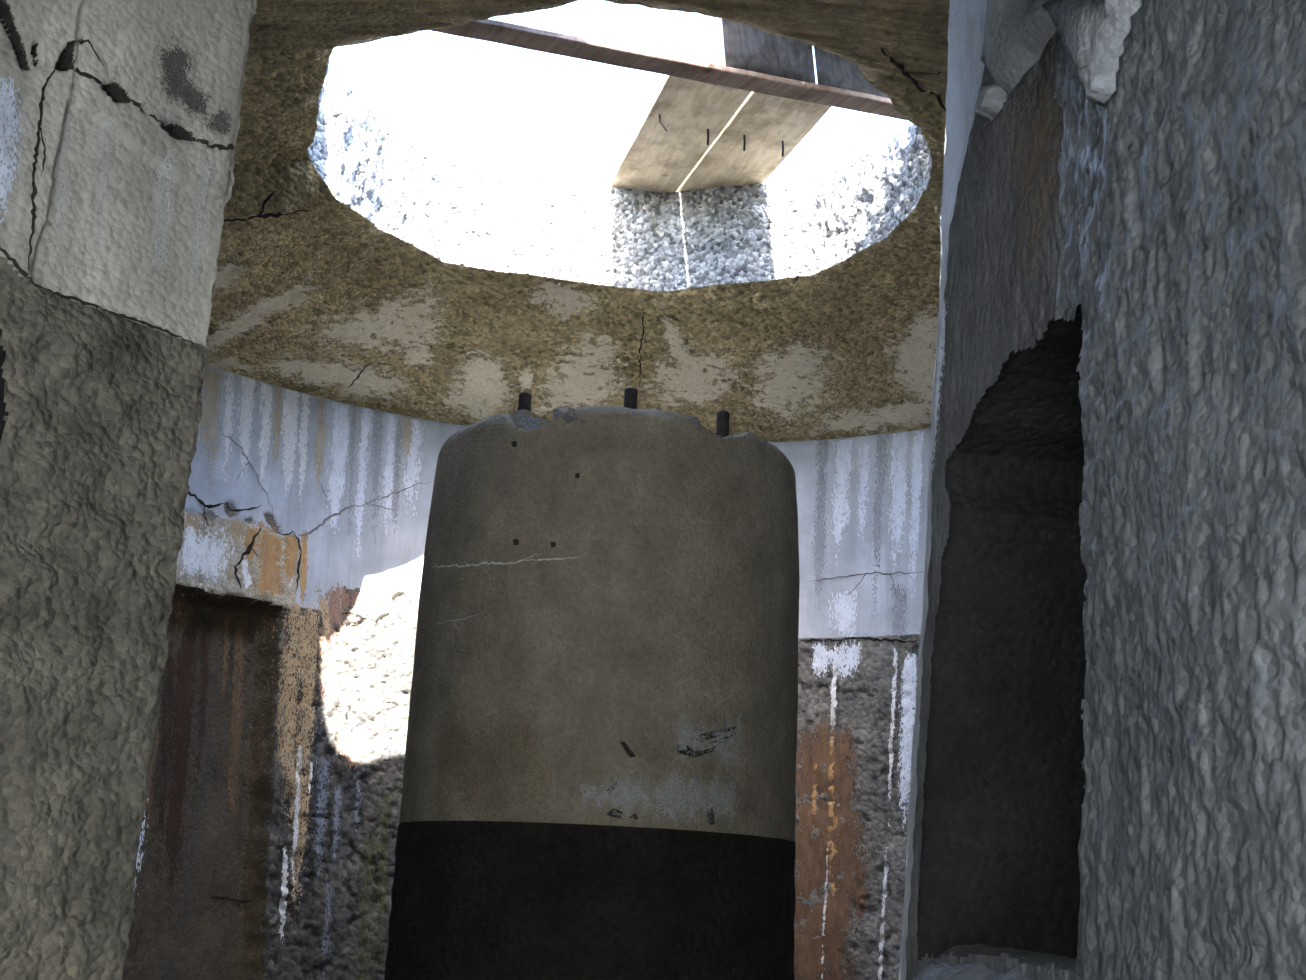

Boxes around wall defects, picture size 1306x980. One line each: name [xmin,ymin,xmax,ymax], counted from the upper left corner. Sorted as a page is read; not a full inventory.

crack [0,39,205,347]
crack [199,139,234,150]
water stain [945,0,987,272]
water stain [658,305,700,381]
water stain [173,516,252,600]
spalling [201,501,282,534]
corrosion [220,513,373,943]
water stain [192,368,425,565]
crack [188,434,429,622]
water stain [809,296,947,980]
water stain [278,745,394,980]
corrosion [794,712,877,980]